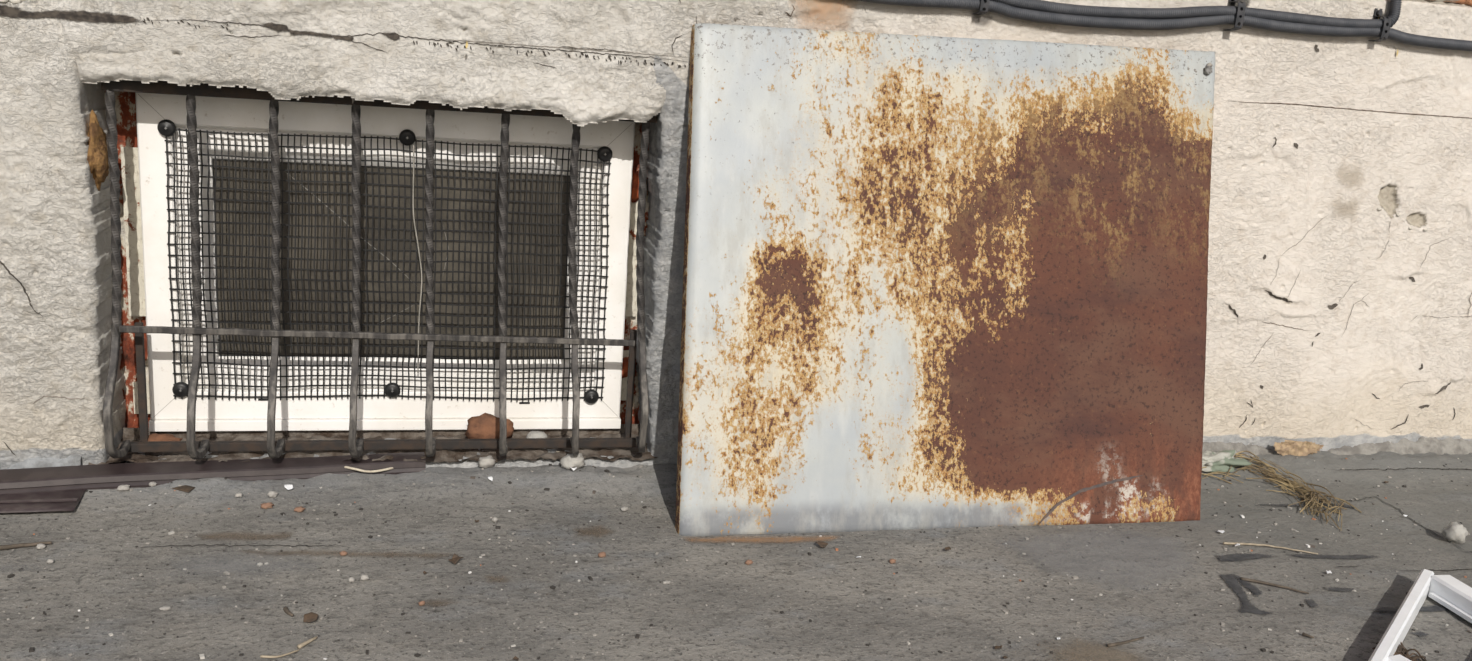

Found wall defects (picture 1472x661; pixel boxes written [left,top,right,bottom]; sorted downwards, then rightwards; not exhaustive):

spalling [0,0,228,30]
crack [150,19,281,38]
crack [344,0,697,68]
spalling [413,41,690,68]
crack [1225,100,1472,119]
crack [1252,214,1329,363]